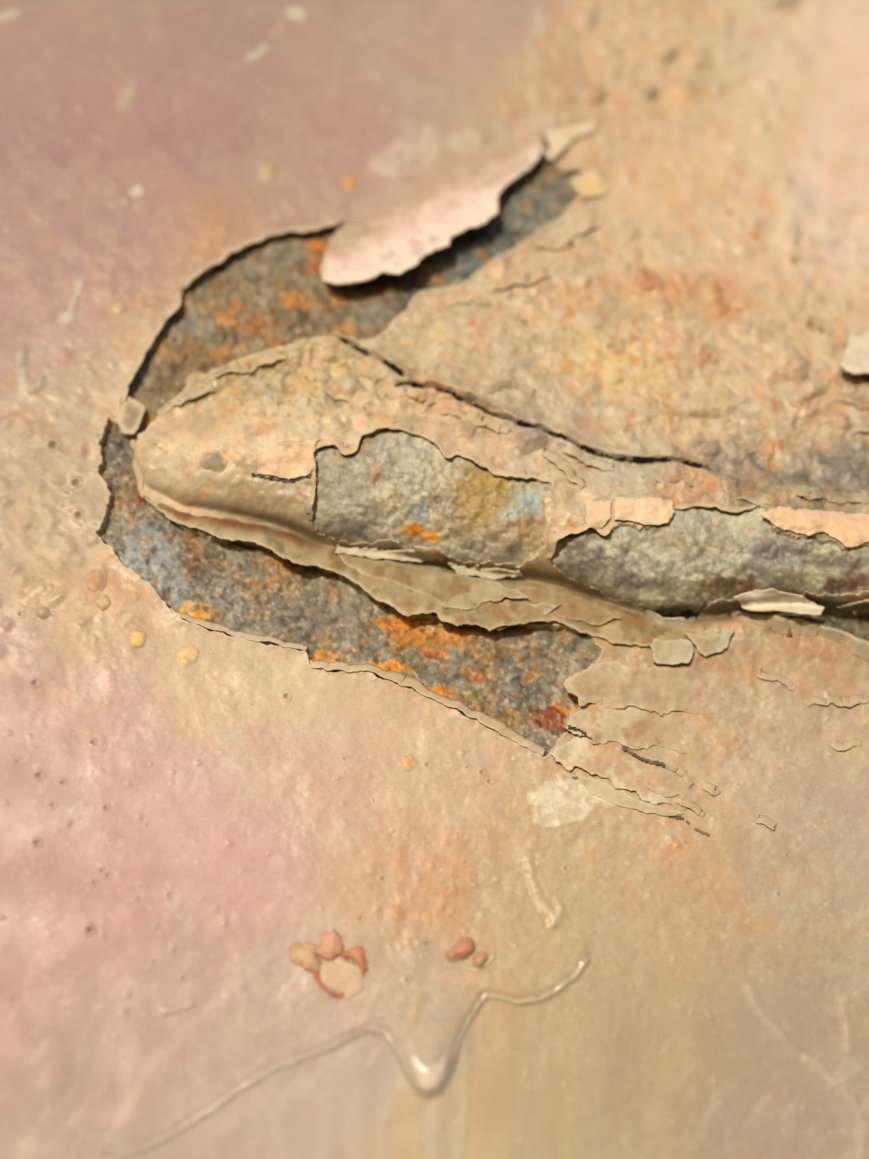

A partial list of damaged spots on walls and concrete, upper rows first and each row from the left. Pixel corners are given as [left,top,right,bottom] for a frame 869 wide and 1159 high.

crack [311,335,710,470]
peeling [100,112,869,831]
corrosion [41,543,152,631]